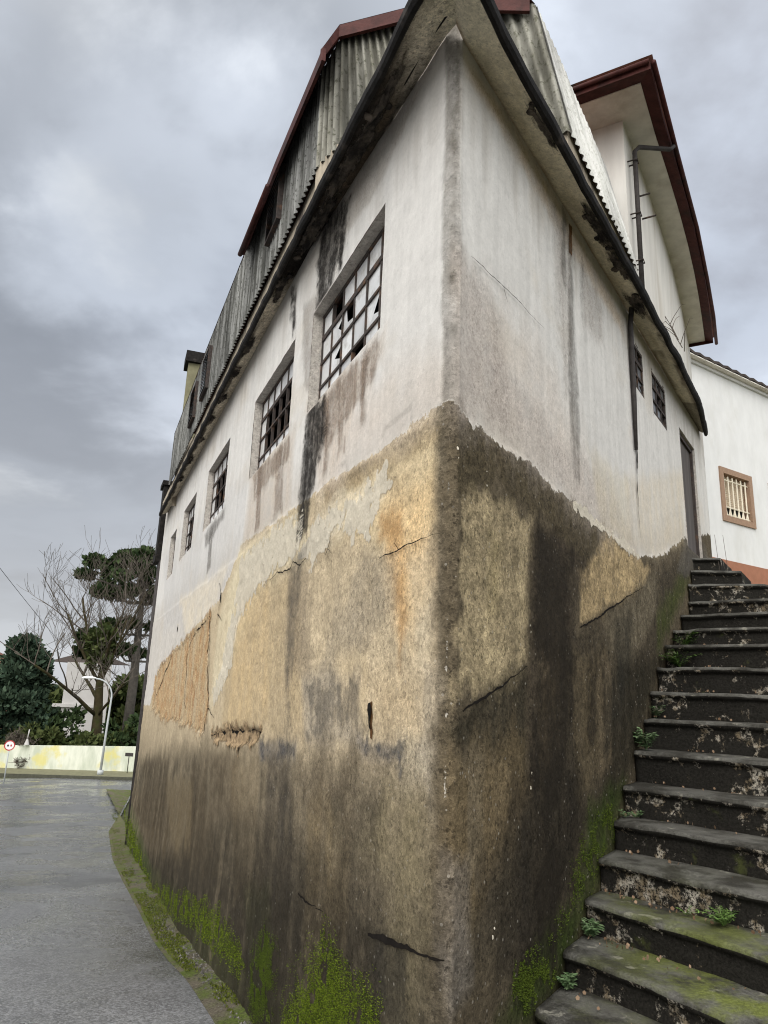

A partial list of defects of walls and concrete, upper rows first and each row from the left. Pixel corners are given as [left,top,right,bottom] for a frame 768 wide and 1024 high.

spalling [526,102,557,150]
leakage [316,195,351,308]
spalling [581,204,630,280]
leakage [296,352,377,540]
crack [380,534,432,558]
spalling [152,459,393,758]
crack [580,590,639,628]
crack [463,666,527,712]
crack [368,933,444,961]